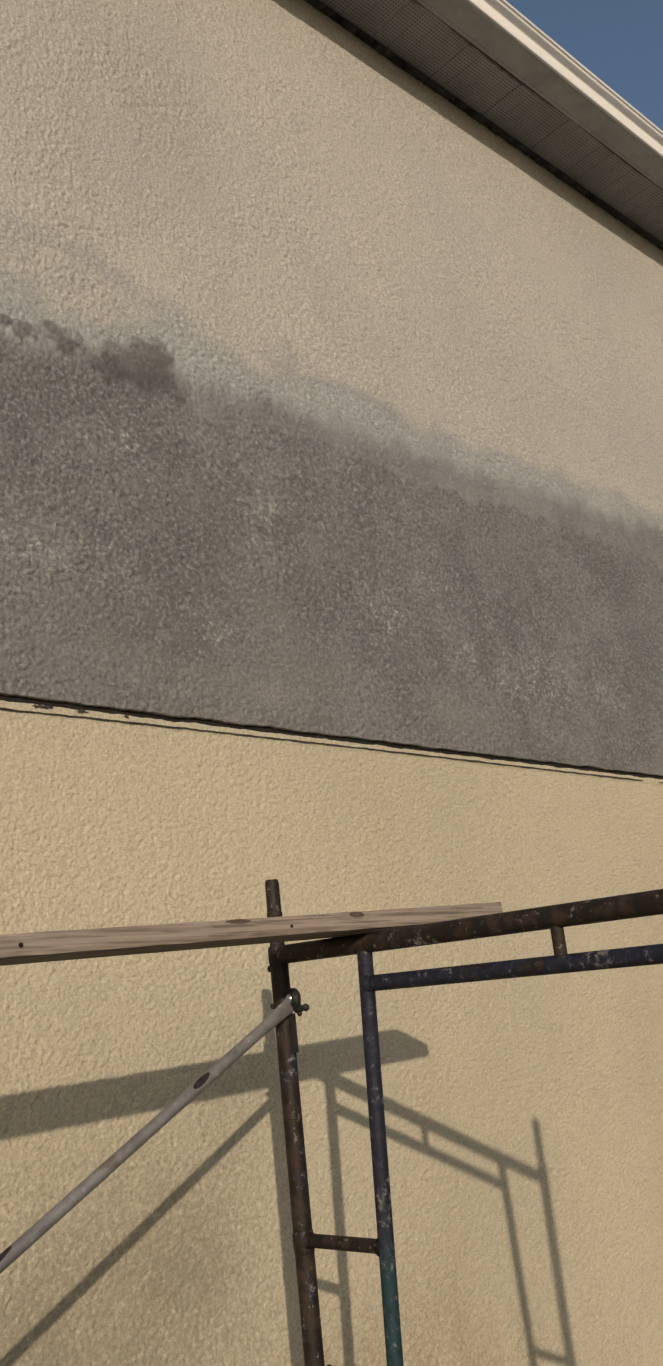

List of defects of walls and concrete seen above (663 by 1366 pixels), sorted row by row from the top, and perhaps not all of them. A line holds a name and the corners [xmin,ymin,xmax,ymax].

damp [461,36,554,107]
damp [0,287,663,776]